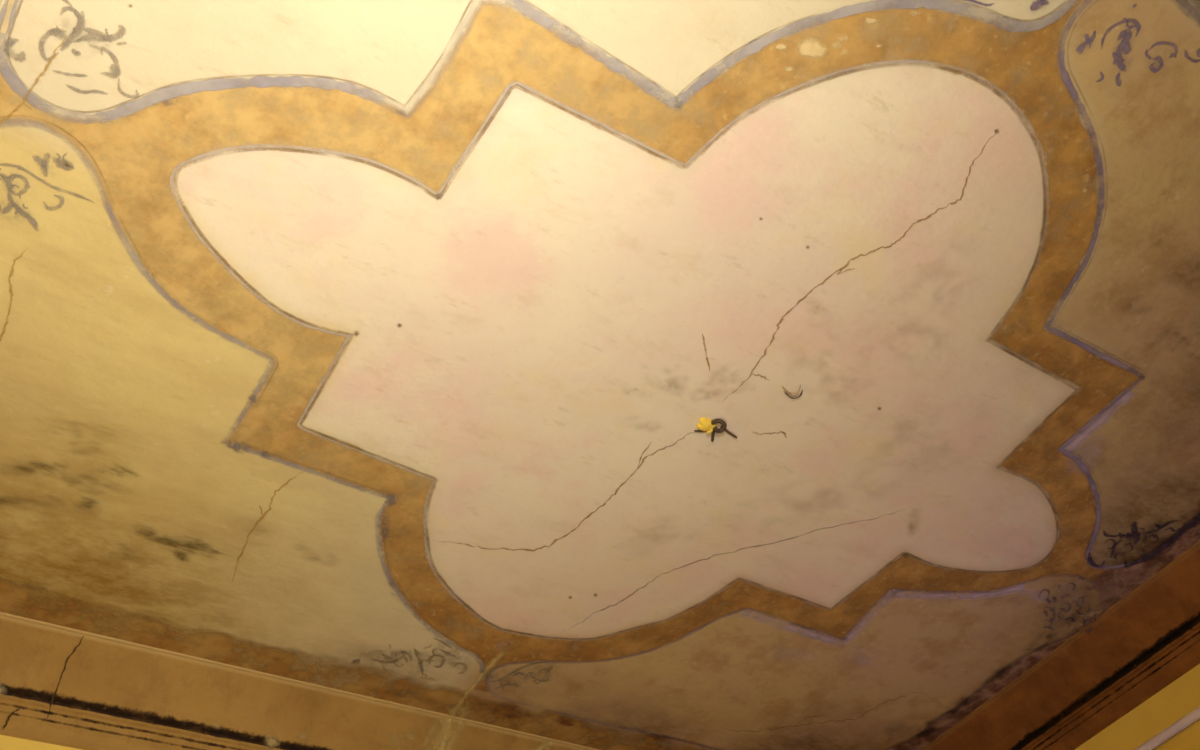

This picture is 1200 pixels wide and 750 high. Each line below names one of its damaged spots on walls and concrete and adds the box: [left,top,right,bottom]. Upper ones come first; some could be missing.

crack [733,129,997,393]
leakage [145,531,199,560]
crack [237,475,297,561]
crack [458,437,684,551]
crack [578,518,877,624]